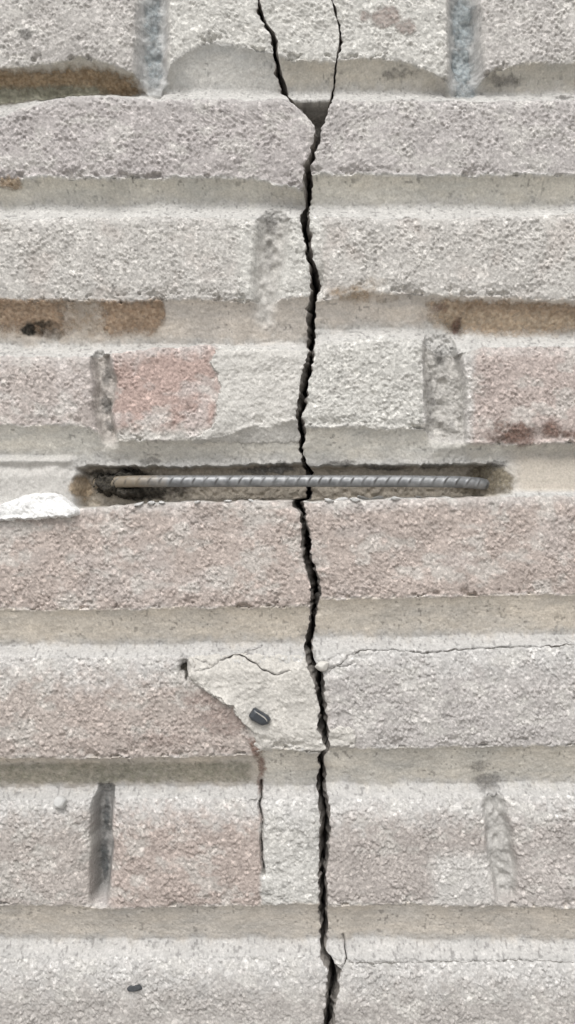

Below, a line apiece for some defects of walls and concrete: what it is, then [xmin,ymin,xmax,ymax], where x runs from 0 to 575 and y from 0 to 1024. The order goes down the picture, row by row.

crack [197,0,573,1024]